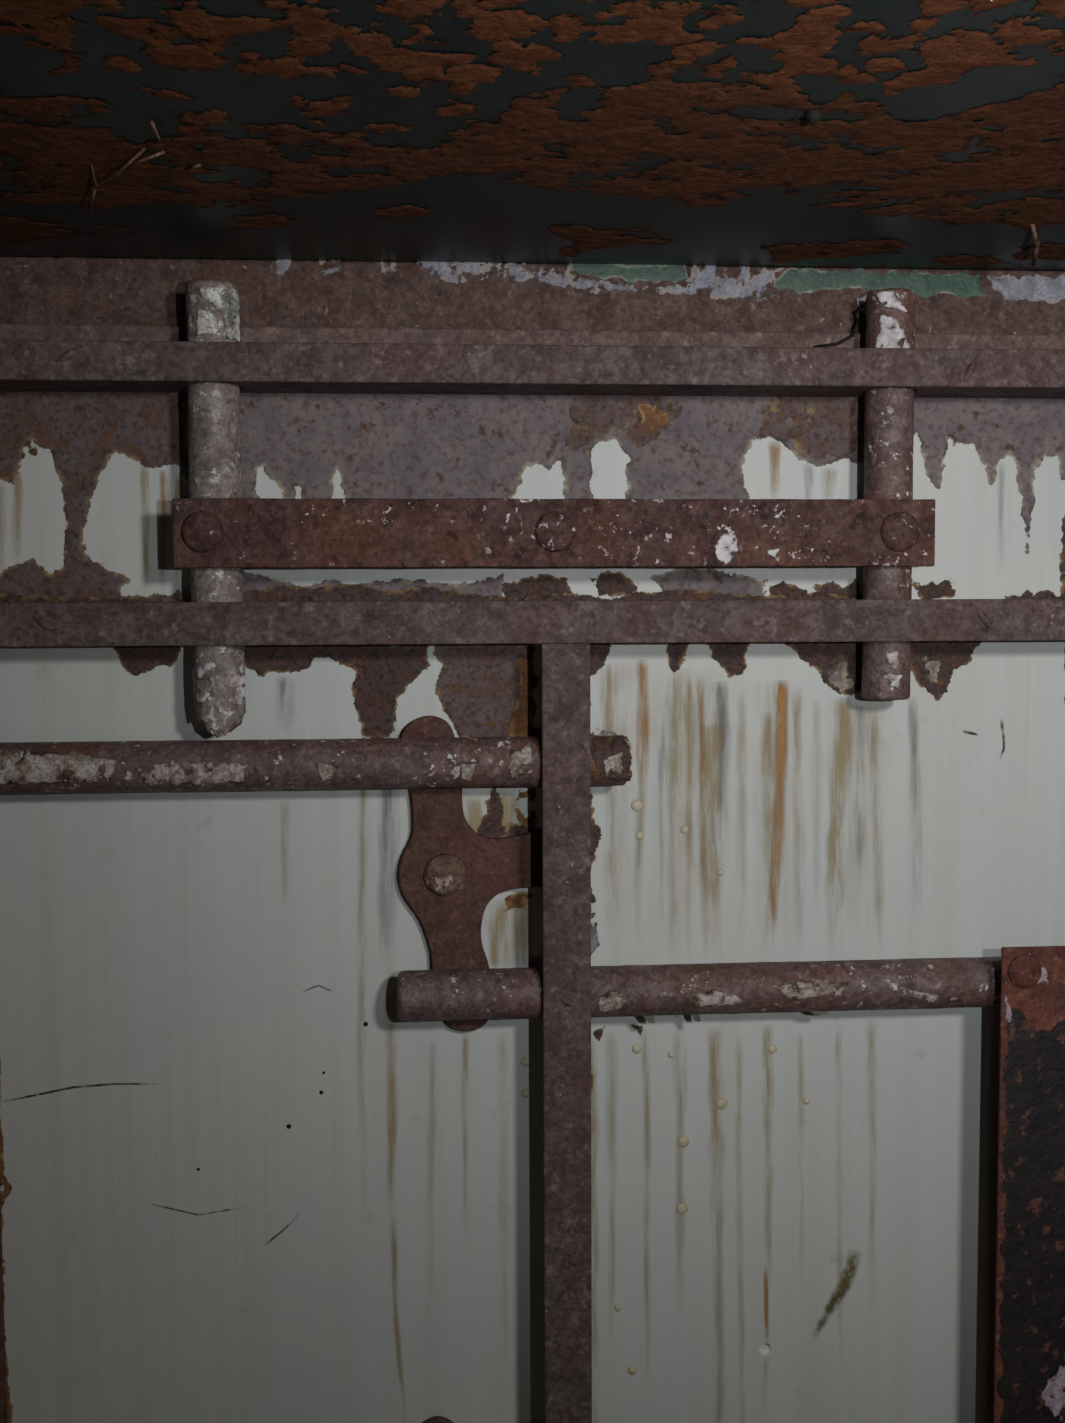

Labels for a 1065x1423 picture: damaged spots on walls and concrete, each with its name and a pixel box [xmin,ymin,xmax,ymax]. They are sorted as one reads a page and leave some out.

peeling [0,0,1065,135]
rust [0,63,1065,266]
peeling [0,391,189,602]
peeling [240,393,865,499]
peeling [914,398,1065,554]
peeling [883,641,984,701]
rust [590,665,648,869]
rust [674,688,725,824]
rust [766,684,797,866]
rust [591,888,600,955]
peeling [996,985,1065,1423]
rust [818,1256,856,1329]